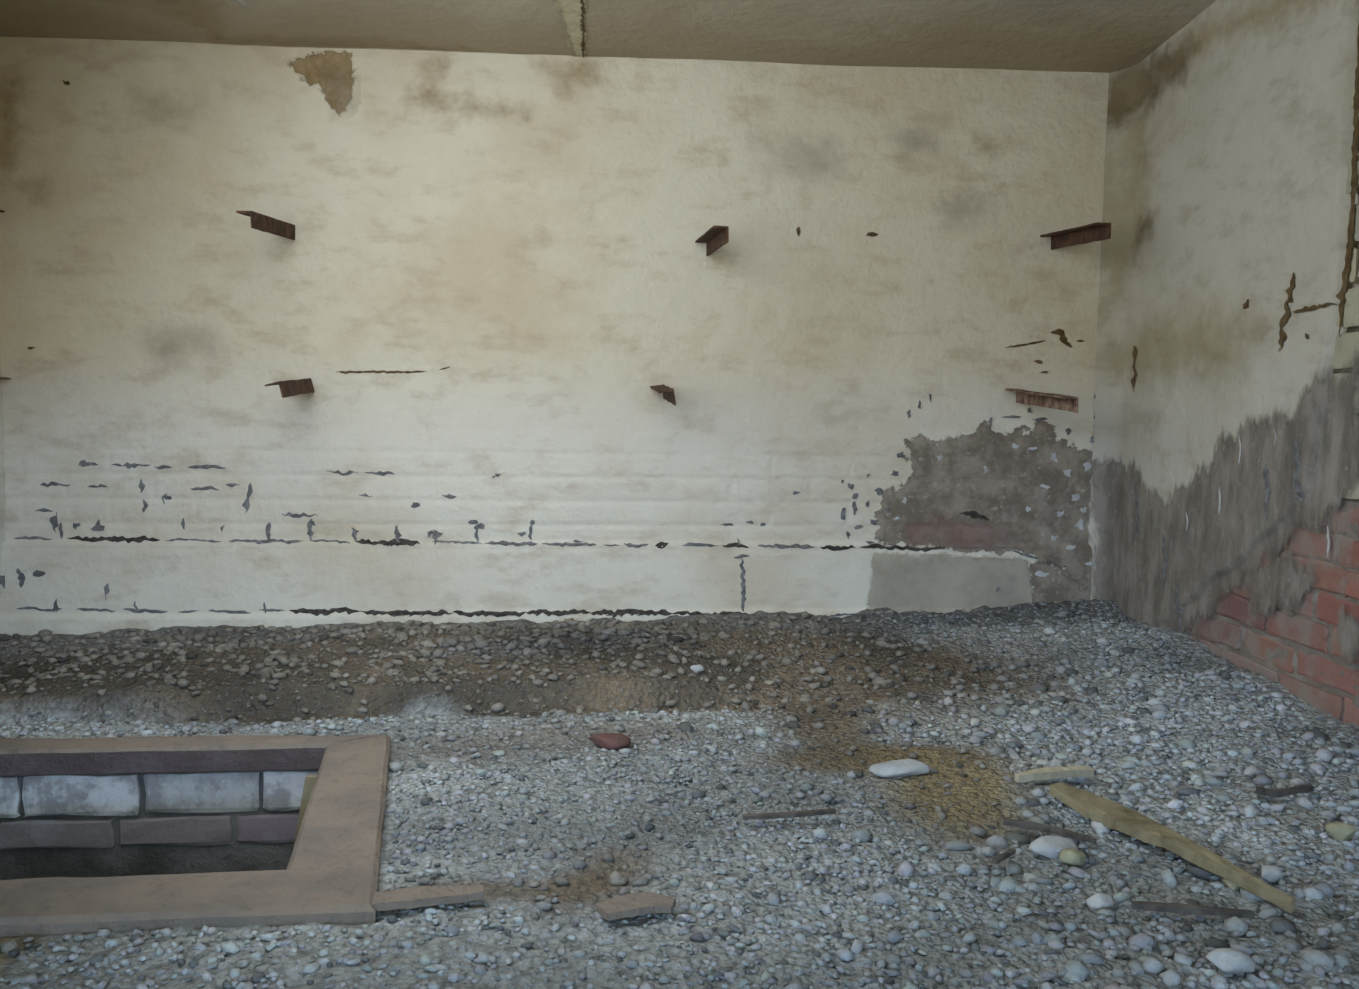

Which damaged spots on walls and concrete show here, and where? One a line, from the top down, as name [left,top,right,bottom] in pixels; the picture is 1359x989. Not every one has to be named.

peeling [289,50,354,114]
crack [579,0,587,58]
peeling [841,408,1094,614]
water stain [1029,354,1359,633]